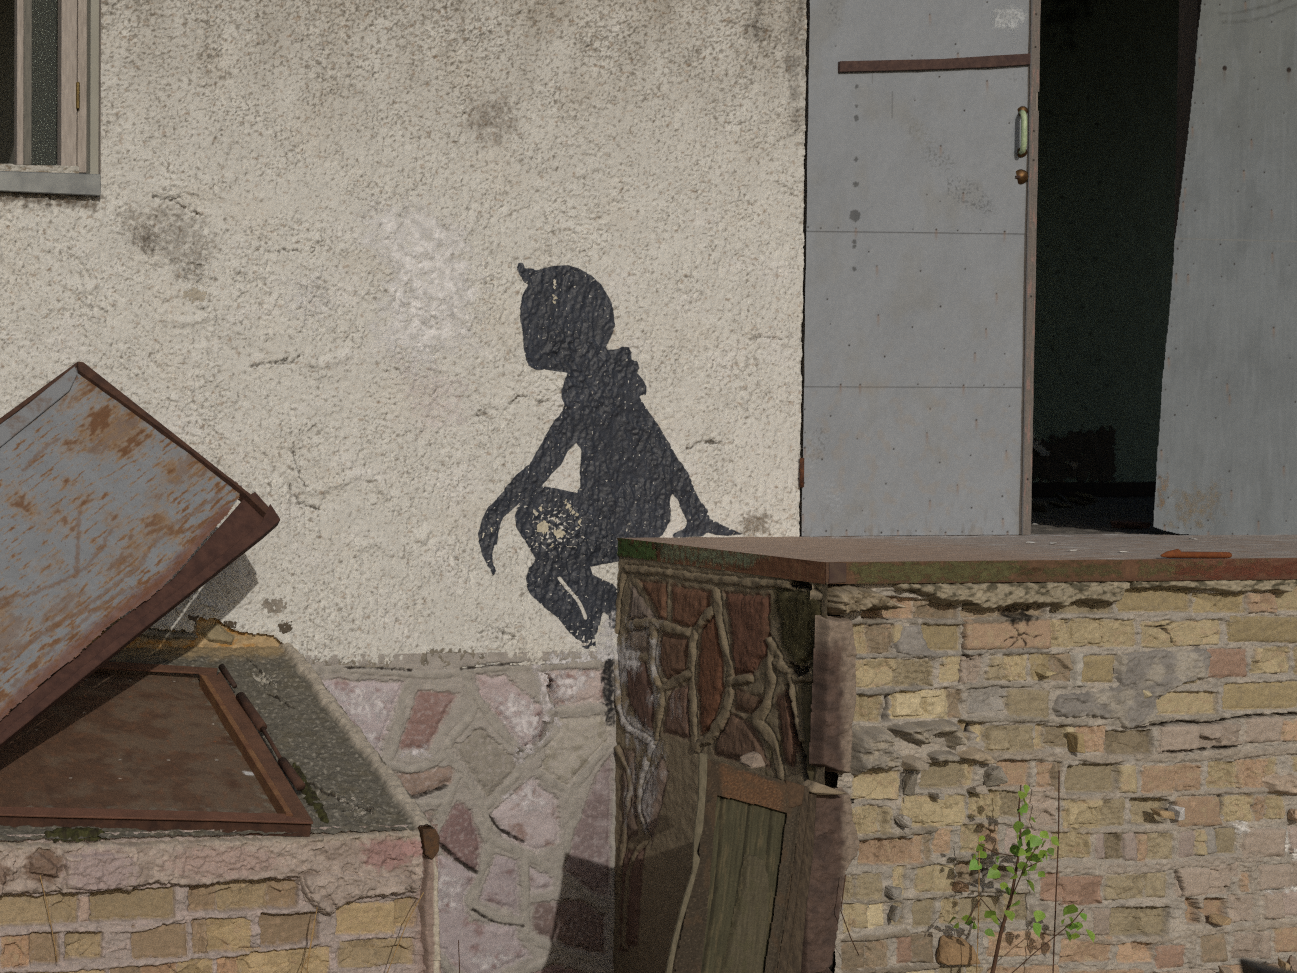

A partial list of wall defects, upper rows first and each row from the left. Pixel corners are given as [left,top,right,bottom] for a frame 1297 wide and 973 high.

spalling [810,579,1297,616]
crack [1004,625,1038,648]
spalling [889,691,946,716]
rust [0,669,277,813]
spalling [966,729,1029,795]
peeling [894,771,945,831]